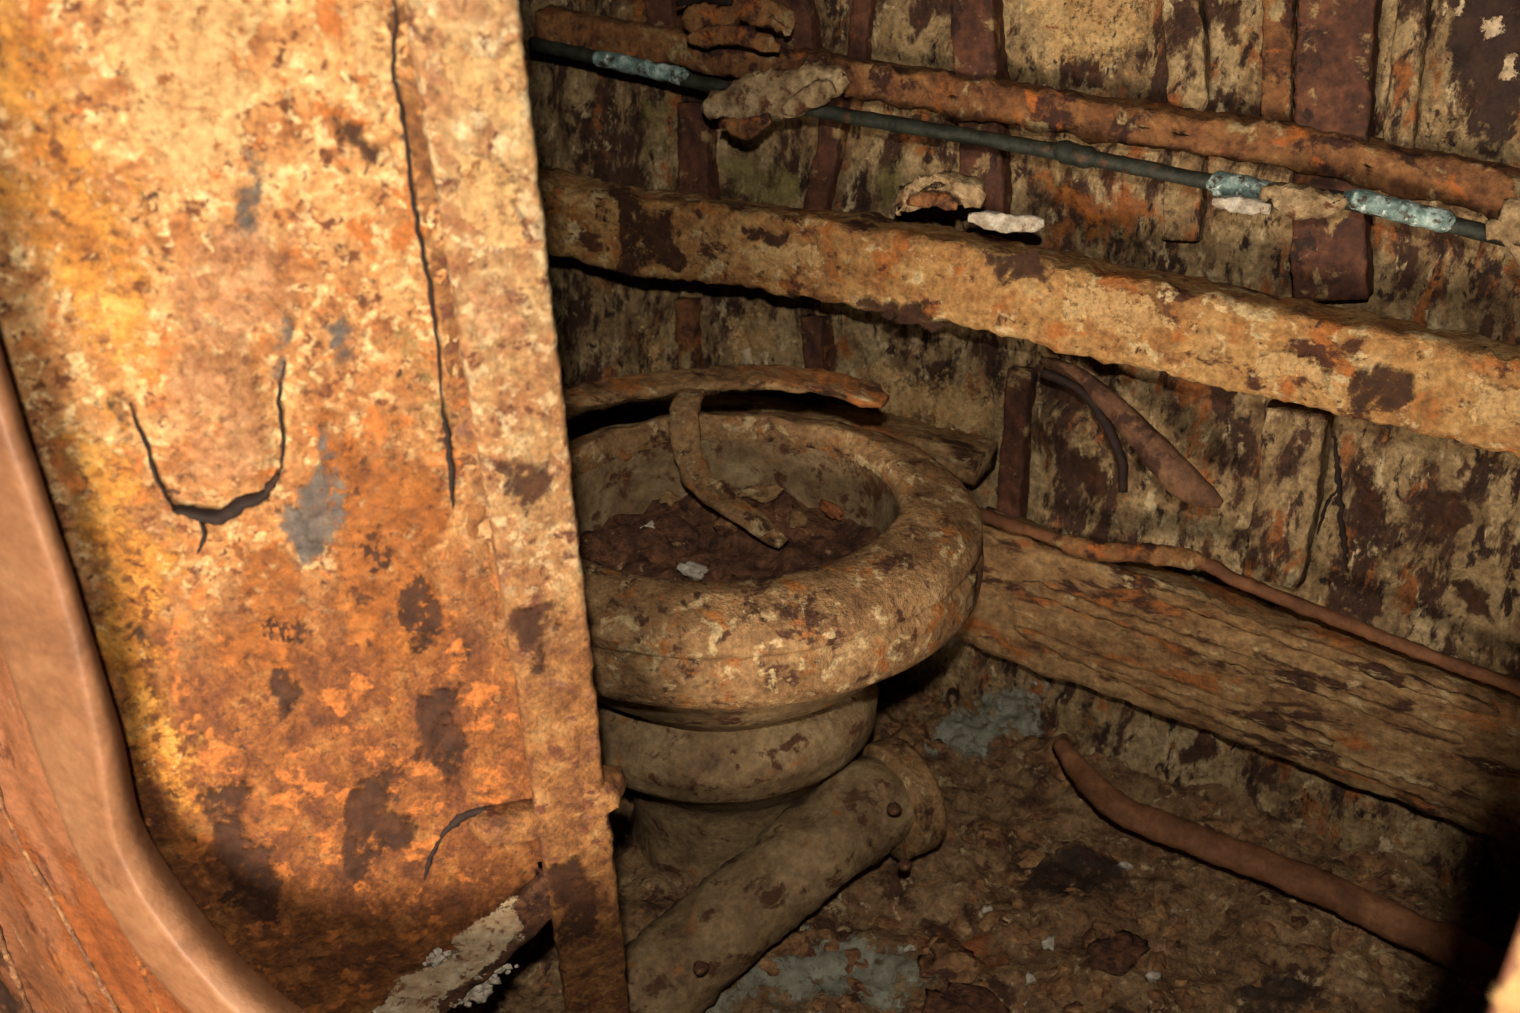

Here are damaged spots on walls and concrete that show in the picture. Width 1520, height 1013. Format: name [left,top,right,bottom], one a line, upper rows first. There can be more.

corrosion [675,0,850,140]
peeling [1445,0,1520,158]
corrosion [331,115,384,175]
corrosion [605,183,687,276]
corrosion [982,248,1051,292]
corrosion [1347,364,1414,415]
corrosion [0,0,284,925]
crack [129,364,285,555]
corrosion [492,460,552,517]
corrosion [507,604,564,675]
corrosion [341,684,467,887]
peeling [1491,938,1520,1013]